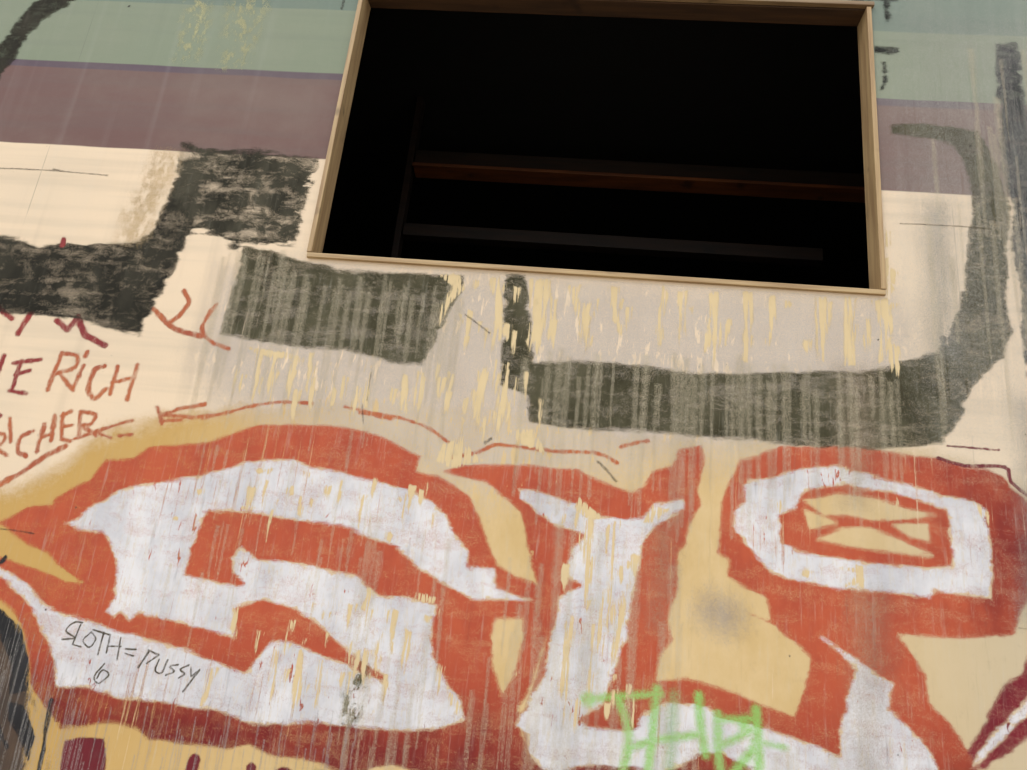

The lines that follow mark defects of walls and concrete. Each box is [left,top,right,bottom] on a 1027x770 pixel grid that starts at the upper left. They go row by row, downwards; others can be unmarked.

peeling [231,346,373,424]
peeling [389,274,633,468]
peeling [701,290,792,363]
peeling [802,231,901,376]